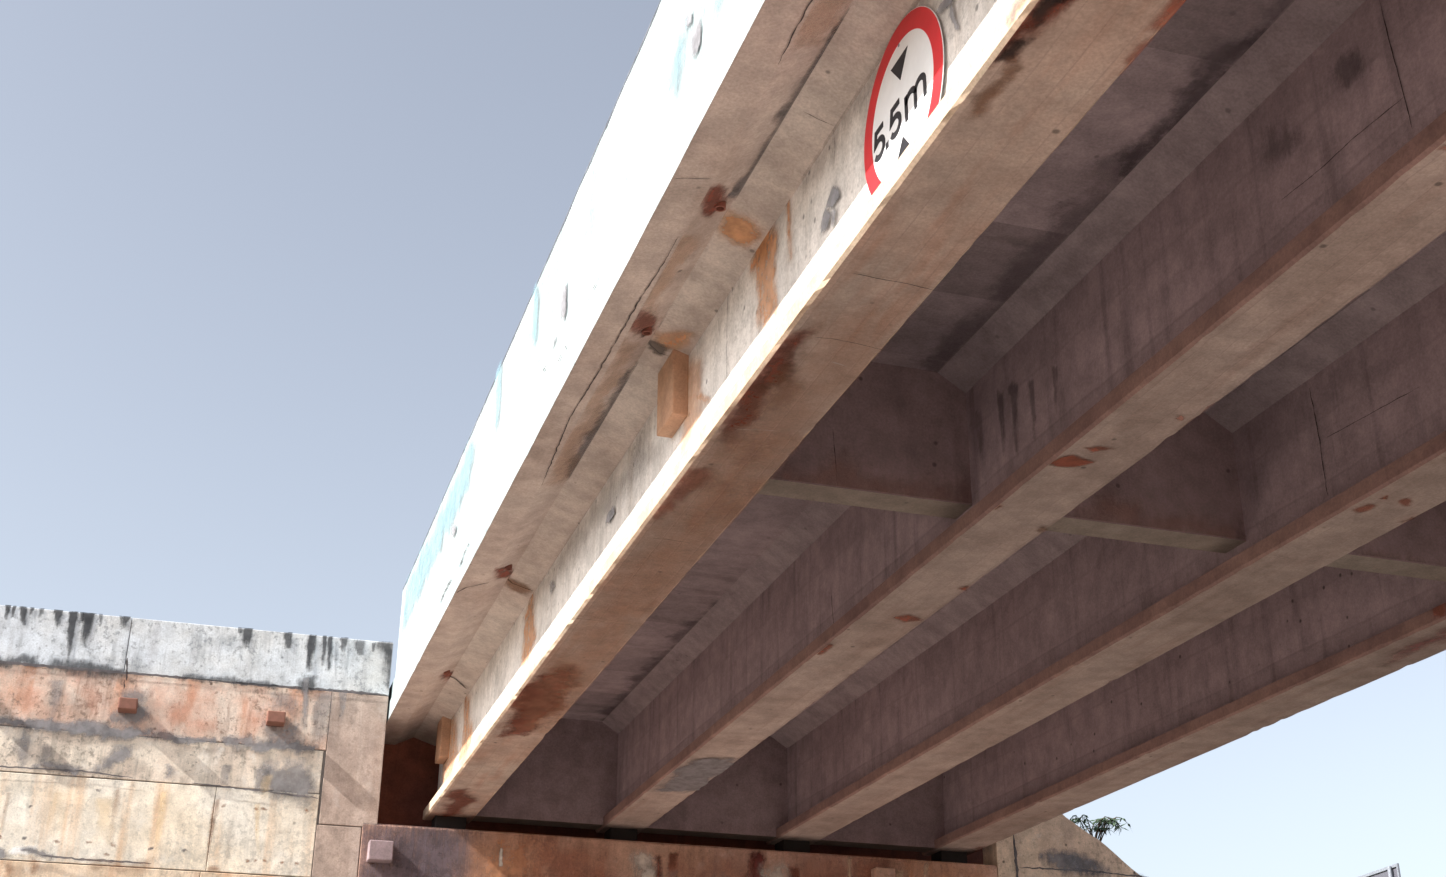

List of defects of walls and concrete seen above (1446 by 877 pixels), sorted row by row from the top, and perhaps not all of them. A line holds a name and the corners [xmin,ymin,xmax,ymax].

rust [974,0,1070,114]
rust [703,187,790,322]
water stain [0,605,393,799]
rust [501,666,578,736]
rust [474,840,531,877]
rust [655,854,678,877]
rust [746,851,766,877]